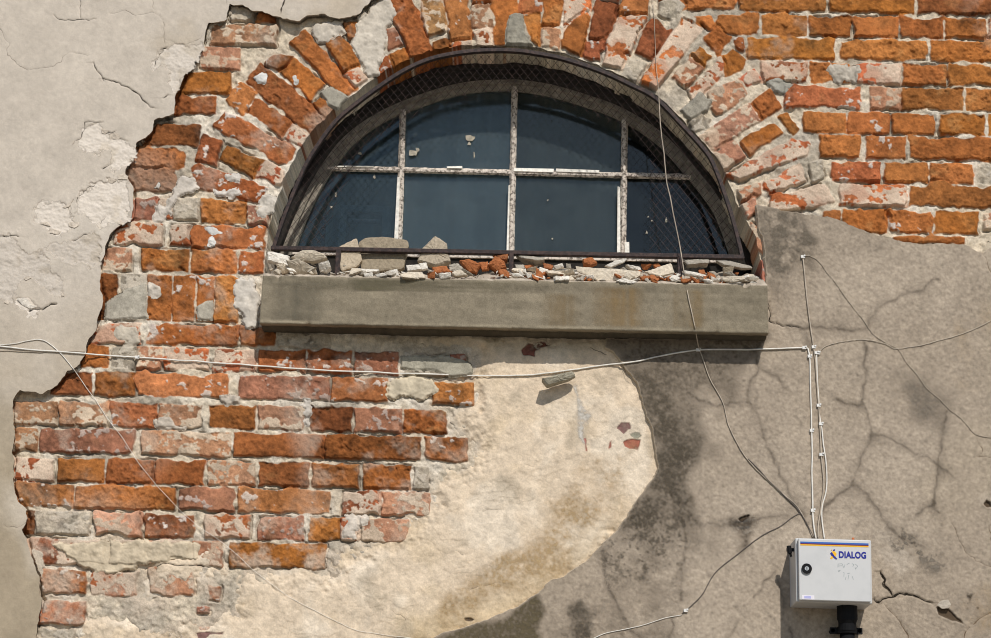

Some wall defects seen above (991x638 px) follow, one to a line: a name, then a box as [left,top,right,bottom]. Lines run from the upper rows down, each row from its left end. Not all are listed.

spalling [665,0,991,253]
spalling [12,6,658,638]
spalling [744,225,765,281]
damp [611,339,763,577]
damp [446,596,543,638]
crack [874,572,931,637]